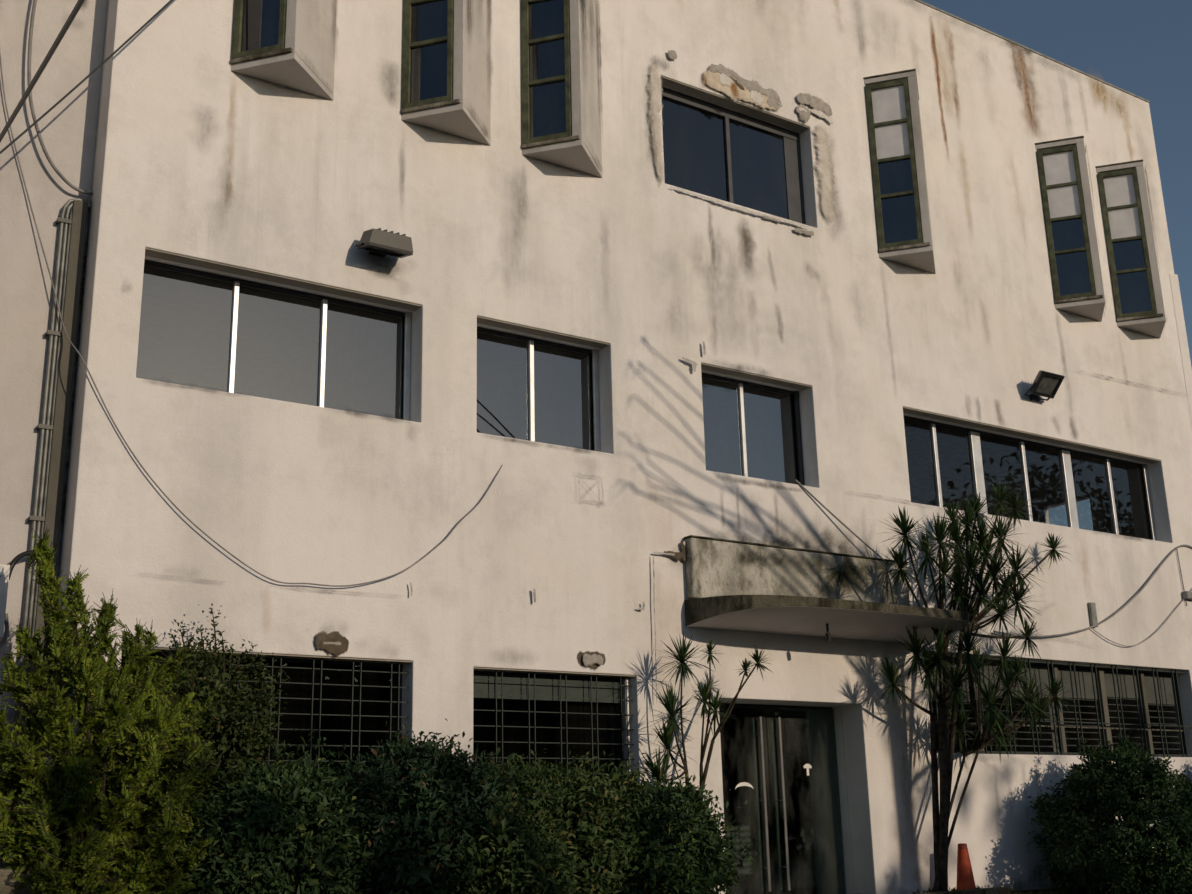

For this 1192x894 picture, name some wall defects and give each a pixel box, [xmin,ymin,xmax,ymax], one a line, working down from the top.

flaking render [648,50,814,236]
flaking render [796,93,833,124]
corrosion [932,33,947,141]
corrosion [1012,43,1032,122]